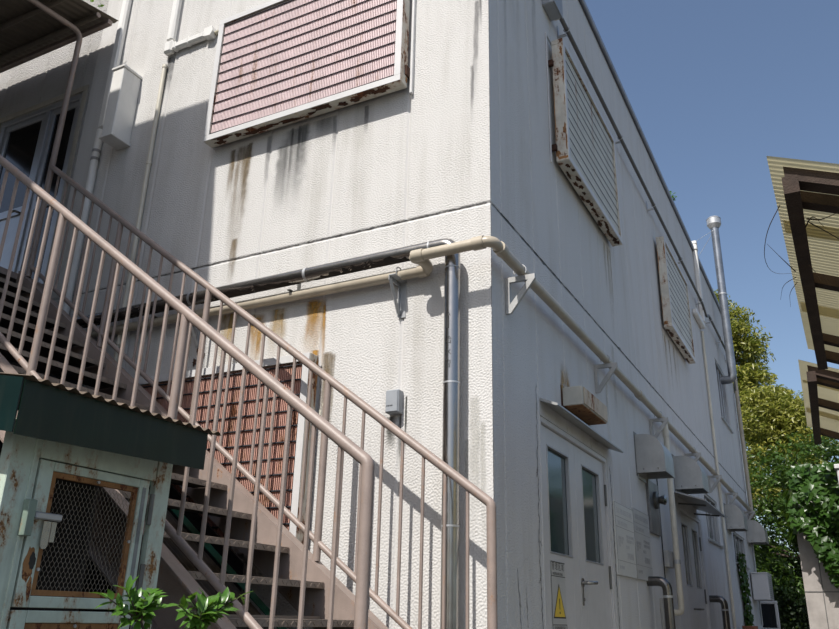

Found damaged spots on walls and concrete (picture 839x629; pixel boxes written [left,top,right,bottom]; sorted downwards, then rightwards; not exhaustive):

rust [213,86,390,184]
rust [553,89,620,245]
rust [309,301,326,329]
rust [661,296,691,363]
crack [517,401,544,629]